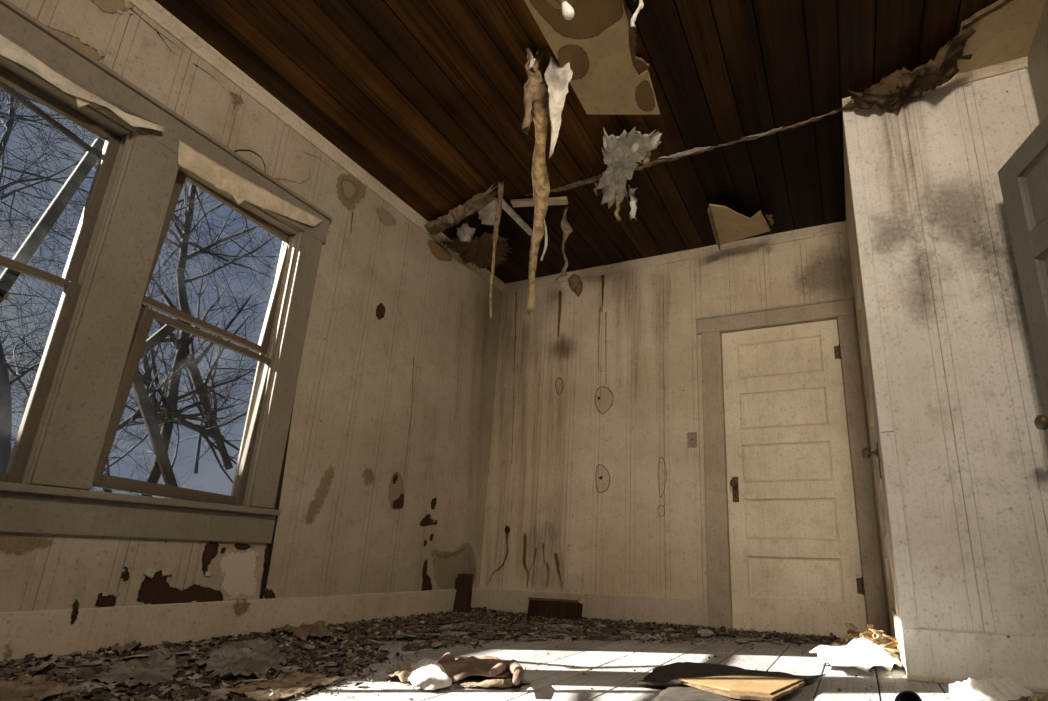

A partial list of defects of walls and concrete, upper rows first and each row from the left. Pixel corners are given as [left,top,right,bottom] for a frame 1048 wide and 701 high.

peeling [91,0,133,14]
water stain [529,0,623,80]
peeling [389,472,404,511]
spalling [420,497,438,547]
spalling [95,542,275,607]
spalling [421,560,432,591]